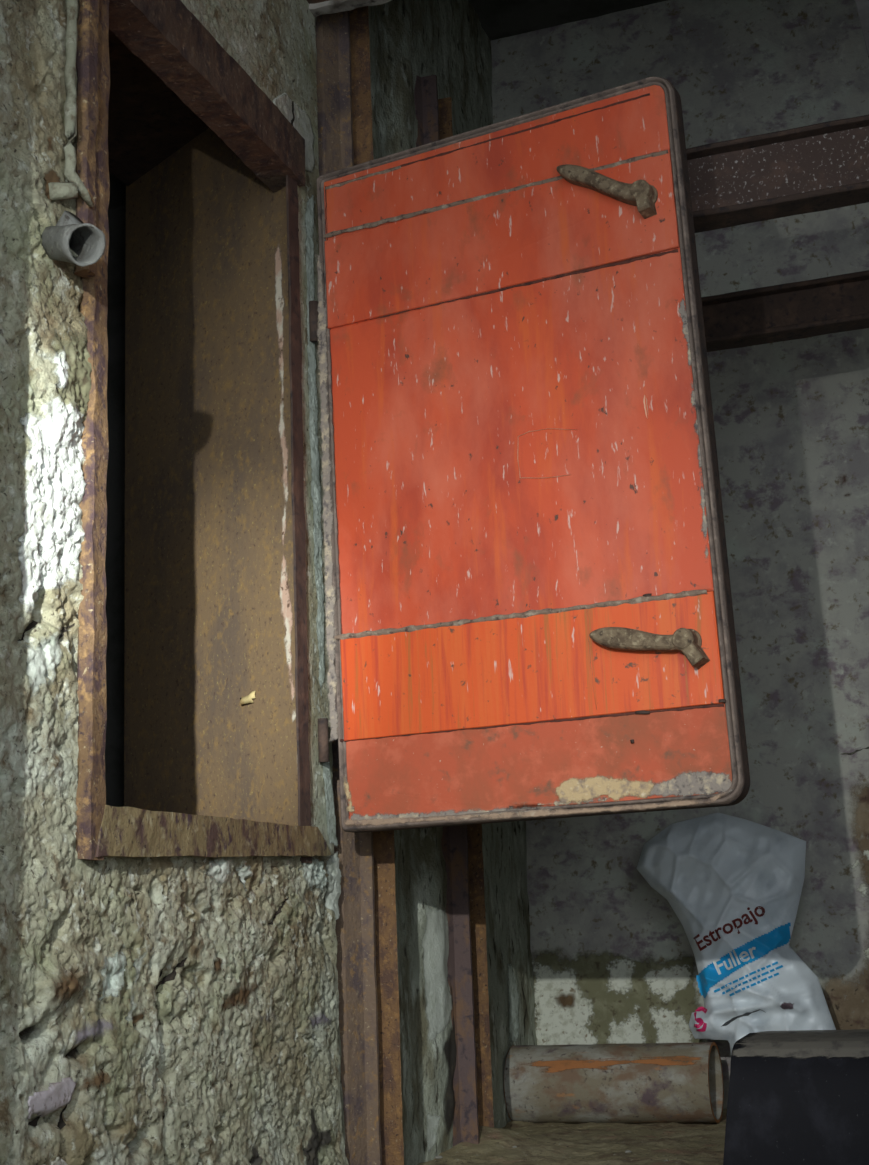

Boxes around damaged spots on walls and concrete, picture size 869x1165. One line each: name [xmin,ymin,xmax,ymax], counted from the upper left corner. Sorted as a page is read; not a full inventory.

flaking render [849,784,869,897]
peeling [532,949,703,1045]
flaking render [823,948,869,1030]